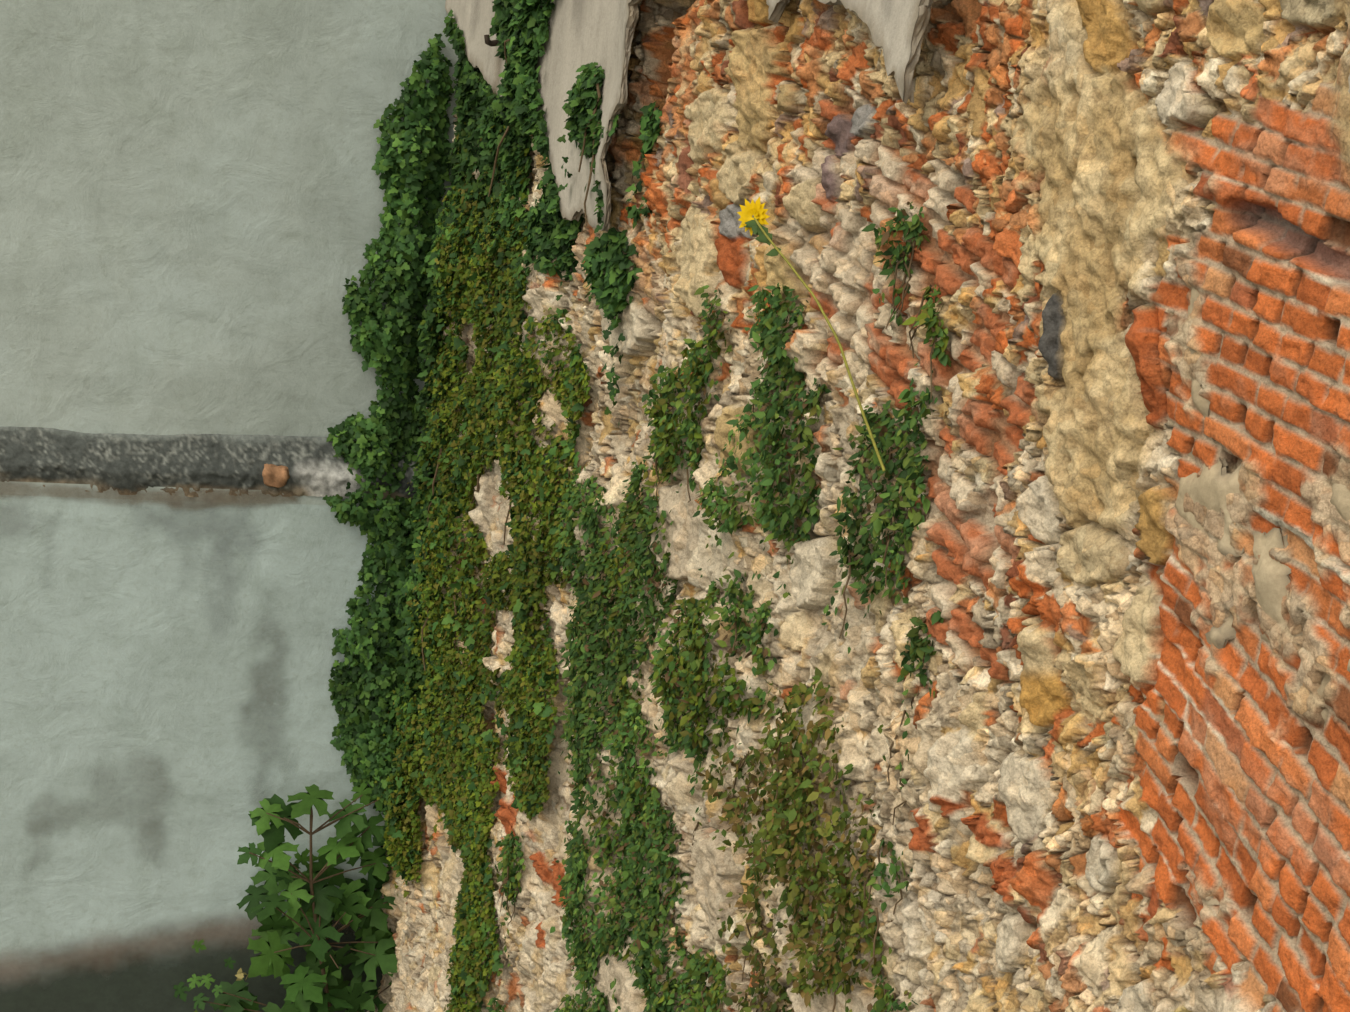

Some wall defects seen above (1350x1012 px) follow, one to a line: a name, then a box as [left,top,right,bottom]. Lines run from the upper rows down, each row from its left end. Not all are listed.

spalling [367,0,1350,1012]
leakage [0,932,307,1012]
leakage [325,917,383,993]